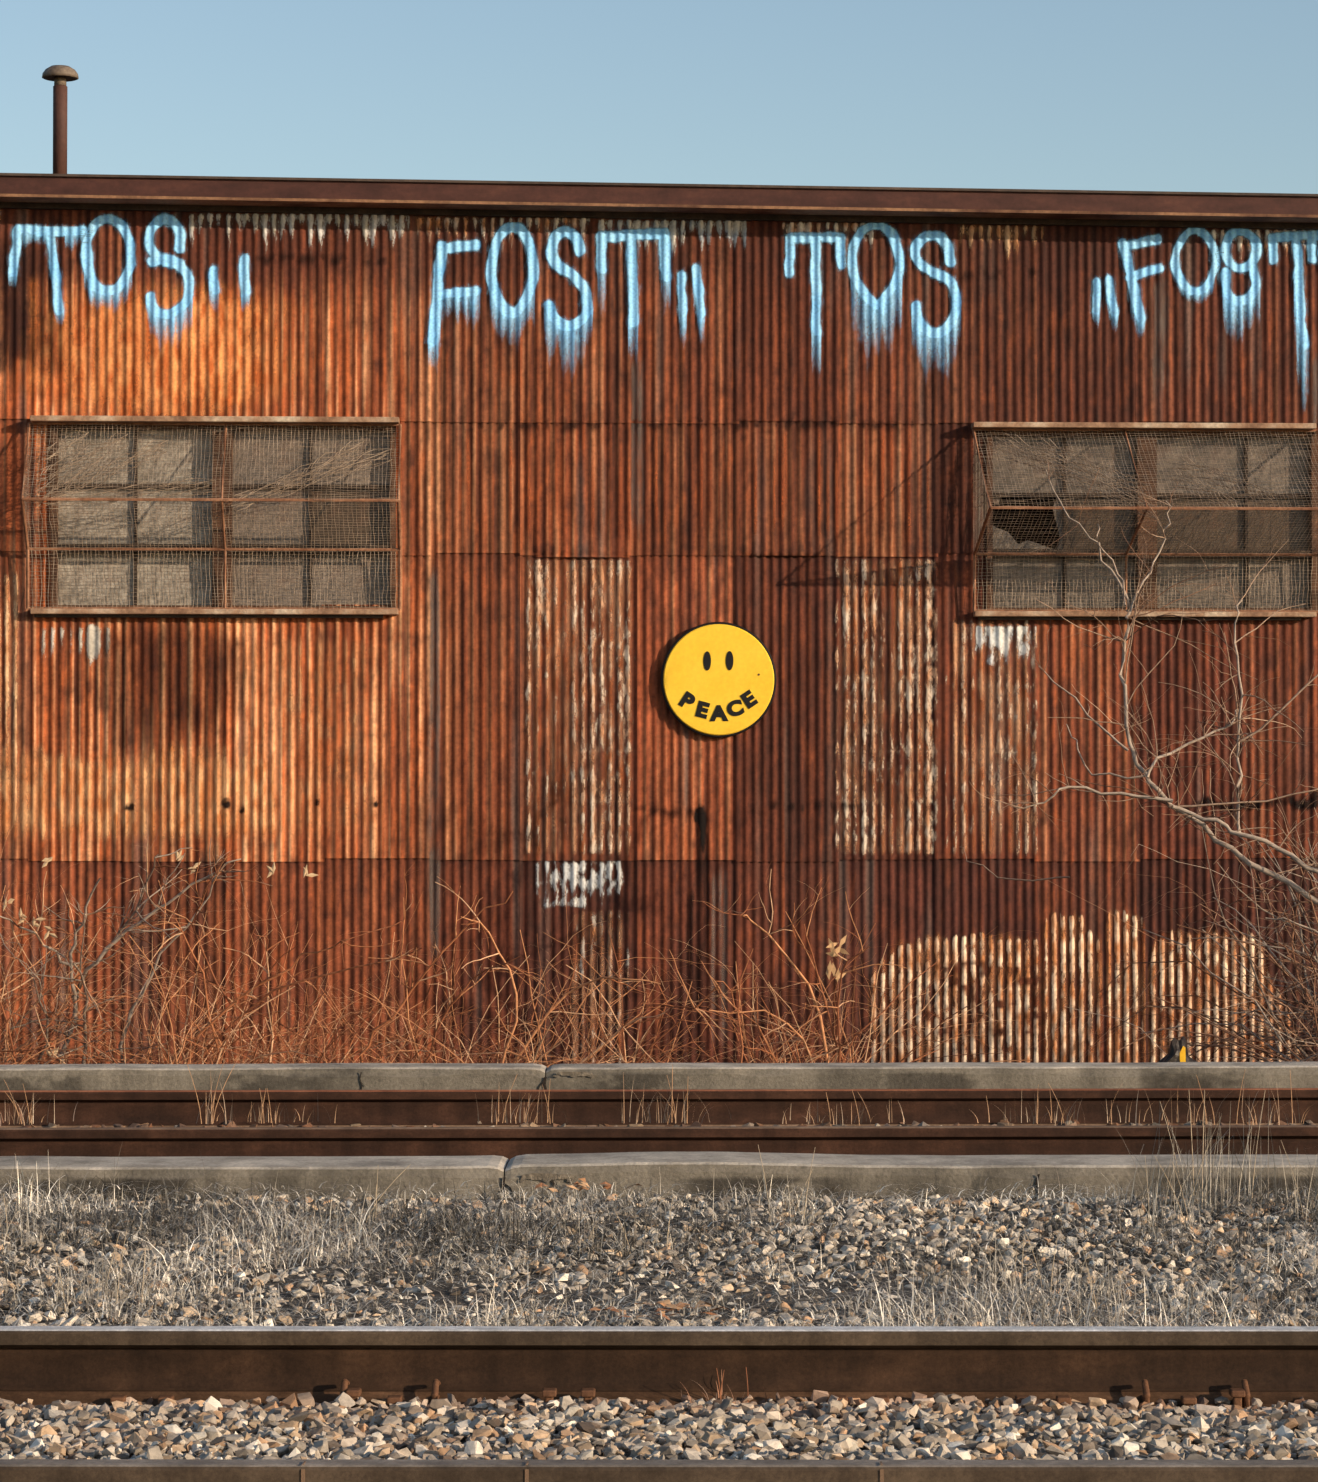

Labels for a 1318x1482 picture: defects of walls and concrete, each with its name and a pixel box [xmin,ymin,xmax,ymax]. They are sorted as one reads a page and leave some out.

rust [30,280,278,415]
rust [754,438,787,532]
rust [818,450,838,529]
rust [3,650,319,837]
peeling [525,559,632,1063]
peeling [835,560,1038,855]
rust [923,1001,953,1034]
rust [940,962,1004,1008]
rust [1016,952,1044,990]
peeling [871,911,1299,1063]